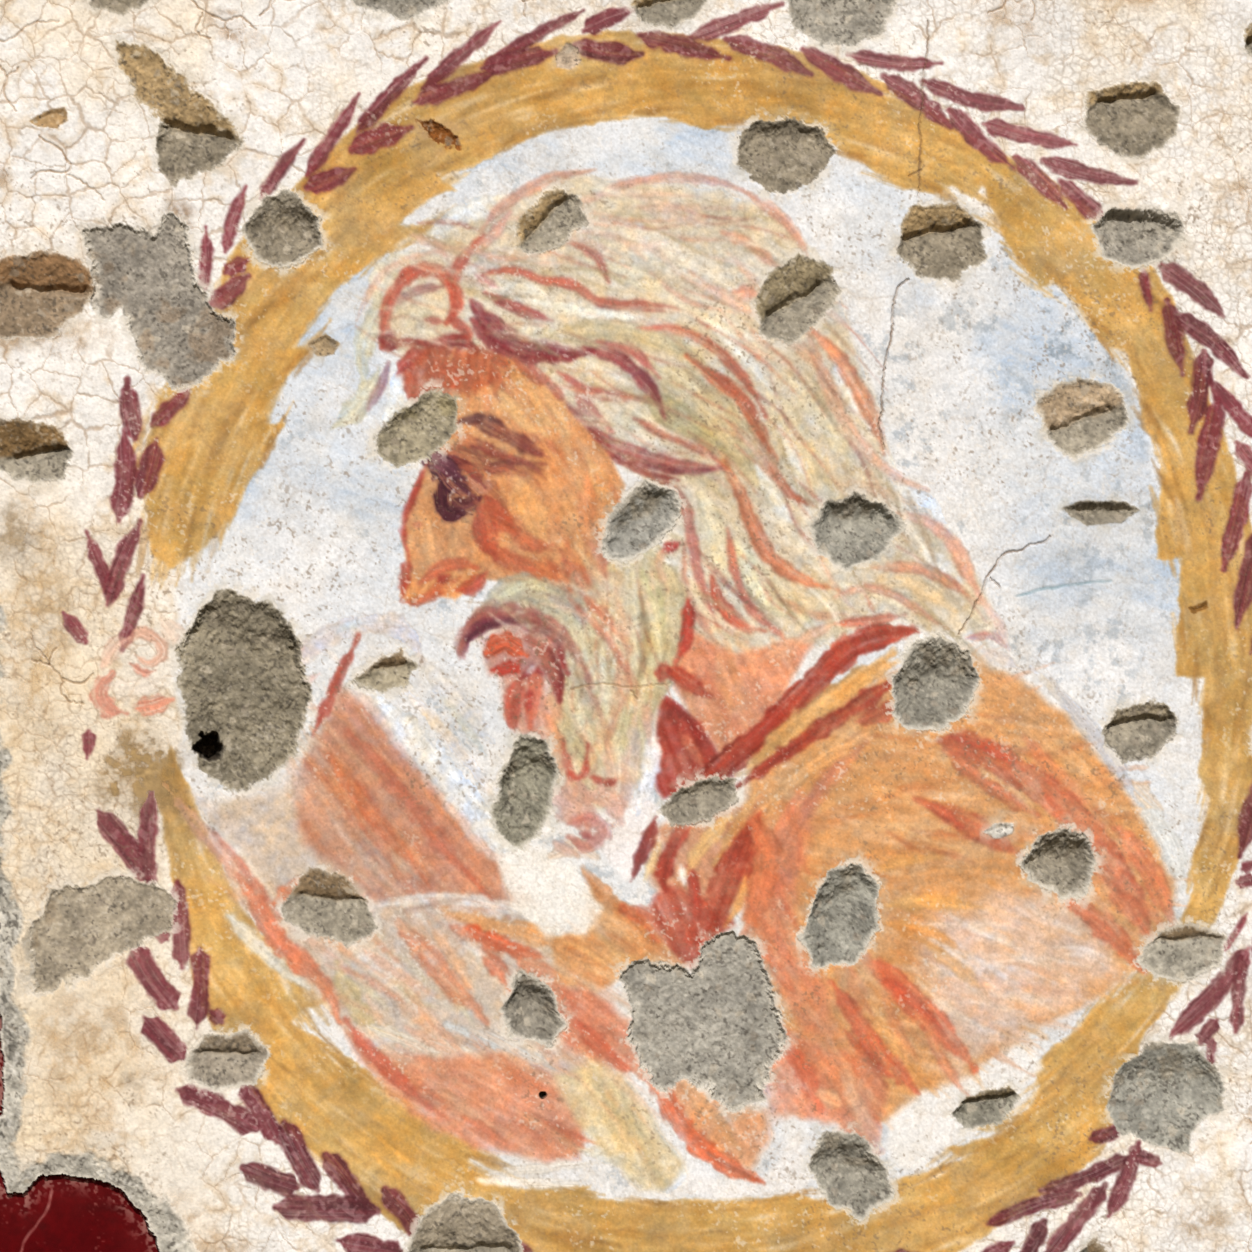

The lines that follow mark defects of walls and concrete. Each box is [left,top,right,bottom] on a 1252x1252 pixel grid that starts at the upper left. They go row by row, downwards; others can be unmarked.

crack [0,20,60,112]
crack [30,136,106,201]
crack [191,0,296,40]
crack [521,0,537,18]
crack [908,21,930,199]
spalling [80,212,238,391]
crack [877,278,910,451]
crack [958,536,1052,635]
spalling [174,589,313,793]
flaking render [0,729,200,1252]
spalling [619,931,789,1114]
spalling [1107,1041,1227,1155]